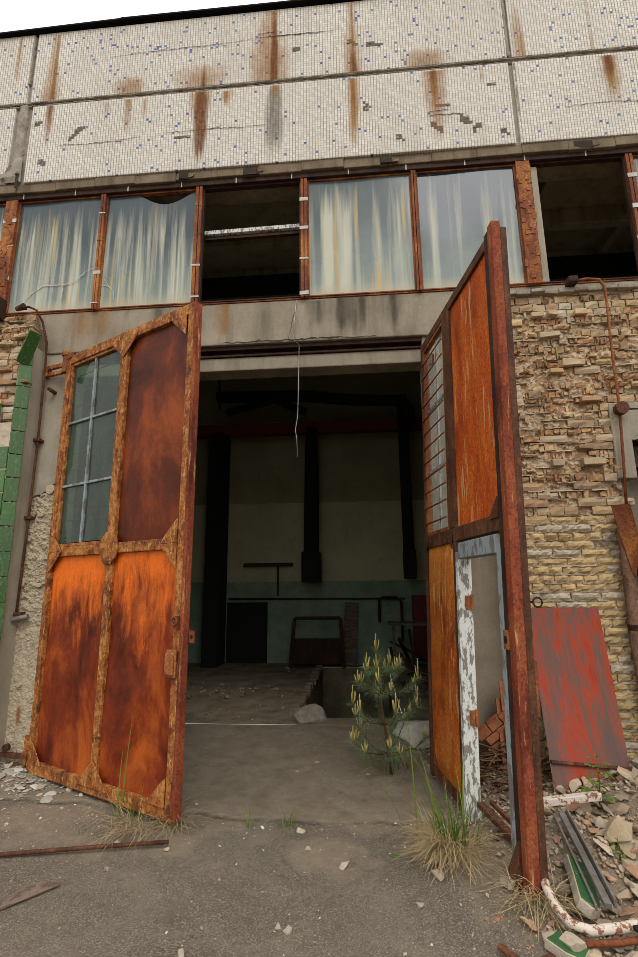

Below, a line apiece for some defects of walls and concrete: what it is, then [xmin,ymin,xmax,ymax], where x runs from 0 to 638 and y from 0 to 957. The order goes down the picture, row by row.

rust [47,34,60,129]
rust [258,10,280,133]
rust [426,60,441,107]
rust [604,55,614,82]
rust [194,69,207,156]
spalling [460,114,482,133]
spalling [0,157,23,188]